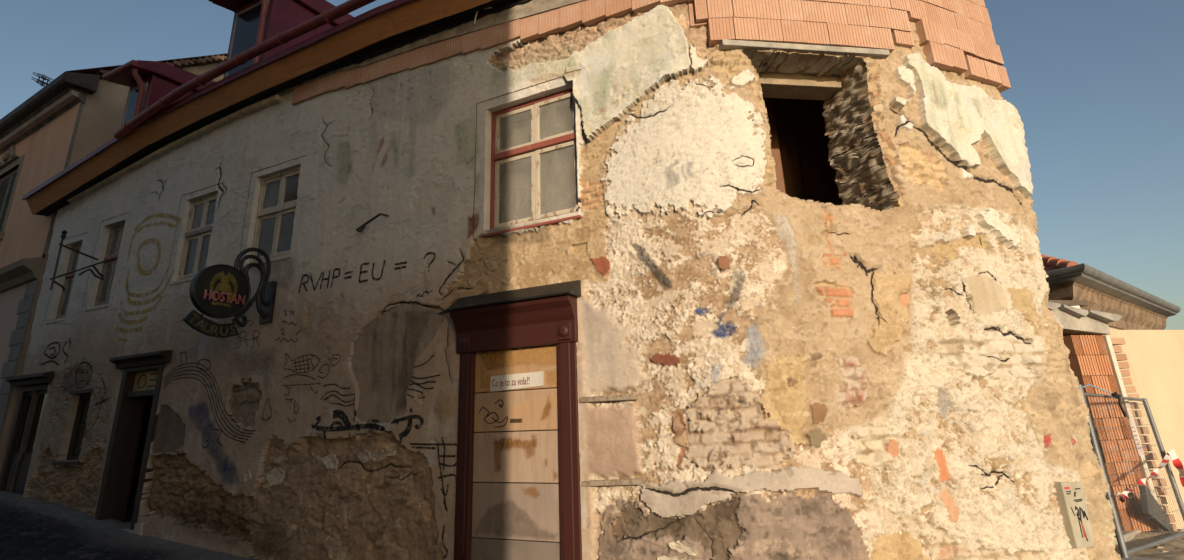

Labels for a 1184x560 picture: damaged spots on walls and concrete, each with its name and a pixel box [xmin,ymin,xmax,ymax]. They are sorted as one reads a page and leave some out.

flaking render [447,1,767,296]
flaking render [867,52,1033,196]
crack [890,108,1023,206]
spalling [813,252,855,319]
crack [829,232,886,324]
spalling [931,208,1021,262]
crack [945,271,1032,362]
spalling [938,286,1049,382]
spalling [144,301,446,560]
spalling [598,352,1048,560]
crack [968,465,1014,489]